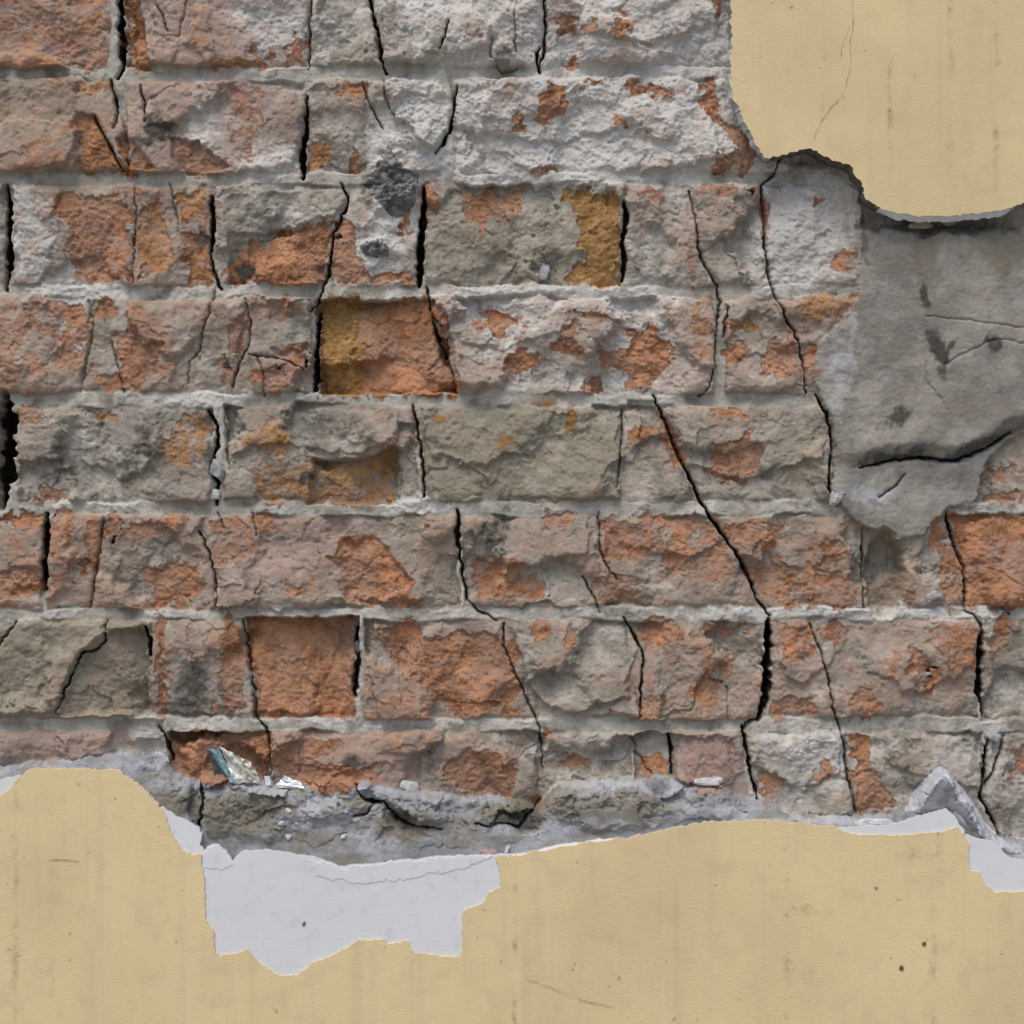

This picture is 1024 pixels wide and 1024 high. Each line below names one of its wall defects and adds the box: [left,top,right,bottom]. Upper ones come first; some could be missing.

spalling [20,31,462,406]
crack [312,185,349,309]
crack [369,0,388,76]
spalling [512,76,685,134]
spalling [693,76,771,241]
spalling [503,309,676,396]
crack [653,397,769,616]
crack [815,396,832,493]
spalling [683,200,1024,698]
crack [453,509,510,658]
spalling [0,403,1024,975]
crack [978,742,1001,826]